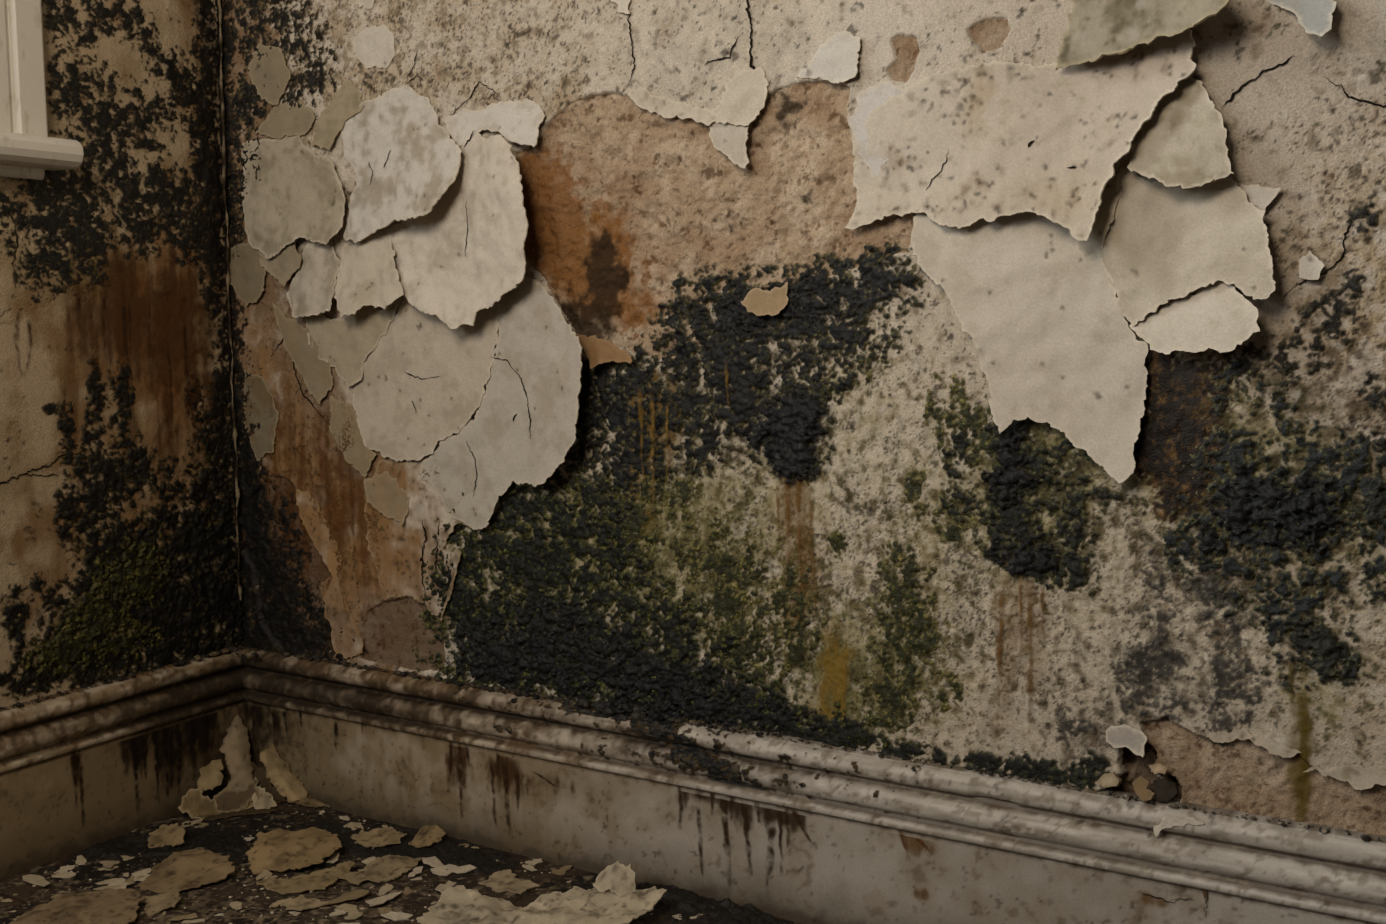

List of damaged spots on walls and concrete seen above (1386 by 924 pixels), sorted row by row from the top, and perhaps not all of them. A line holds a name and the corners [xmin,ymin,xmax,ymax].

crack [623,7,635,92]
crack [704,0,756,70]
peeling [1267,0,1337,37]
crack [0,200,18,316]
leakage [1346,201,1378,237]
leakage [0,0,375,701]
peeling [229,0,1281,671]
leakage [411,241,1386,825]
leakage [678,788,810,873]
flaking render [1097,717,1386,837]